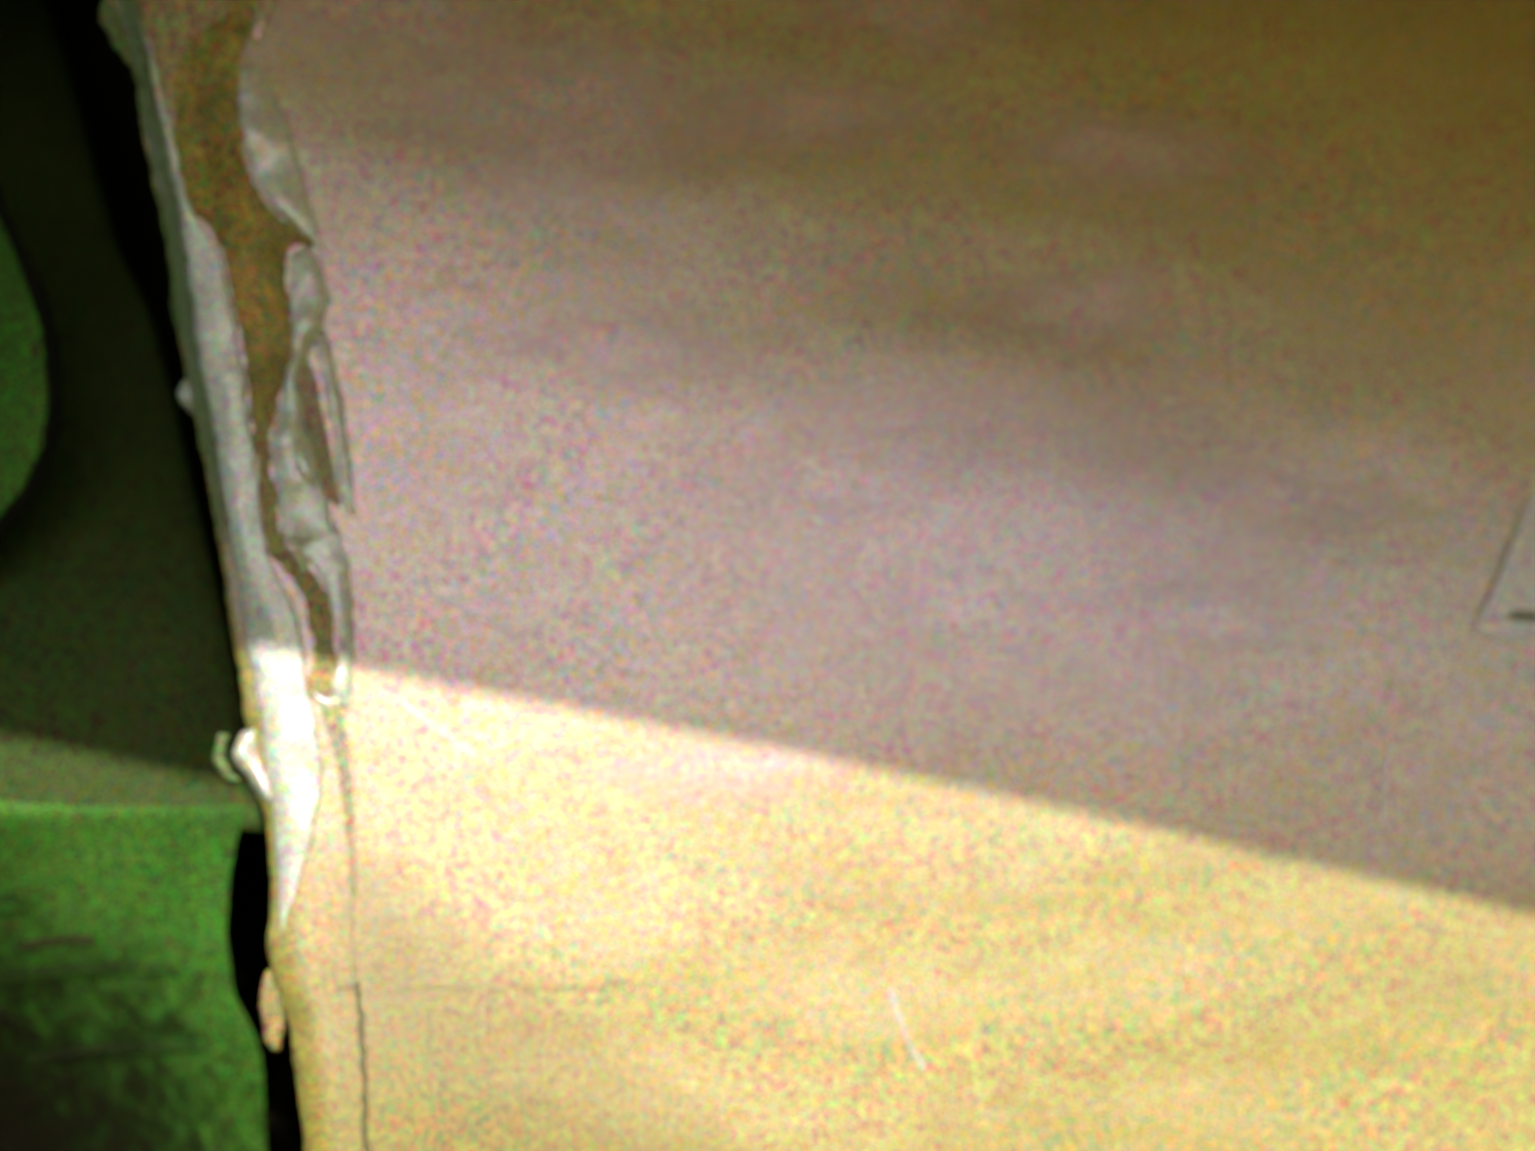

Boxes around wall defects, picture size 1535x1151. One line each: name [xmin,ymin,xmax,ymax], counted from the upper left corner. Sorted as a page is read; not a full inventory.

peeling [99,0,357,939]
spalling [259,969,287,1052]
crack [354,981,371,1151]